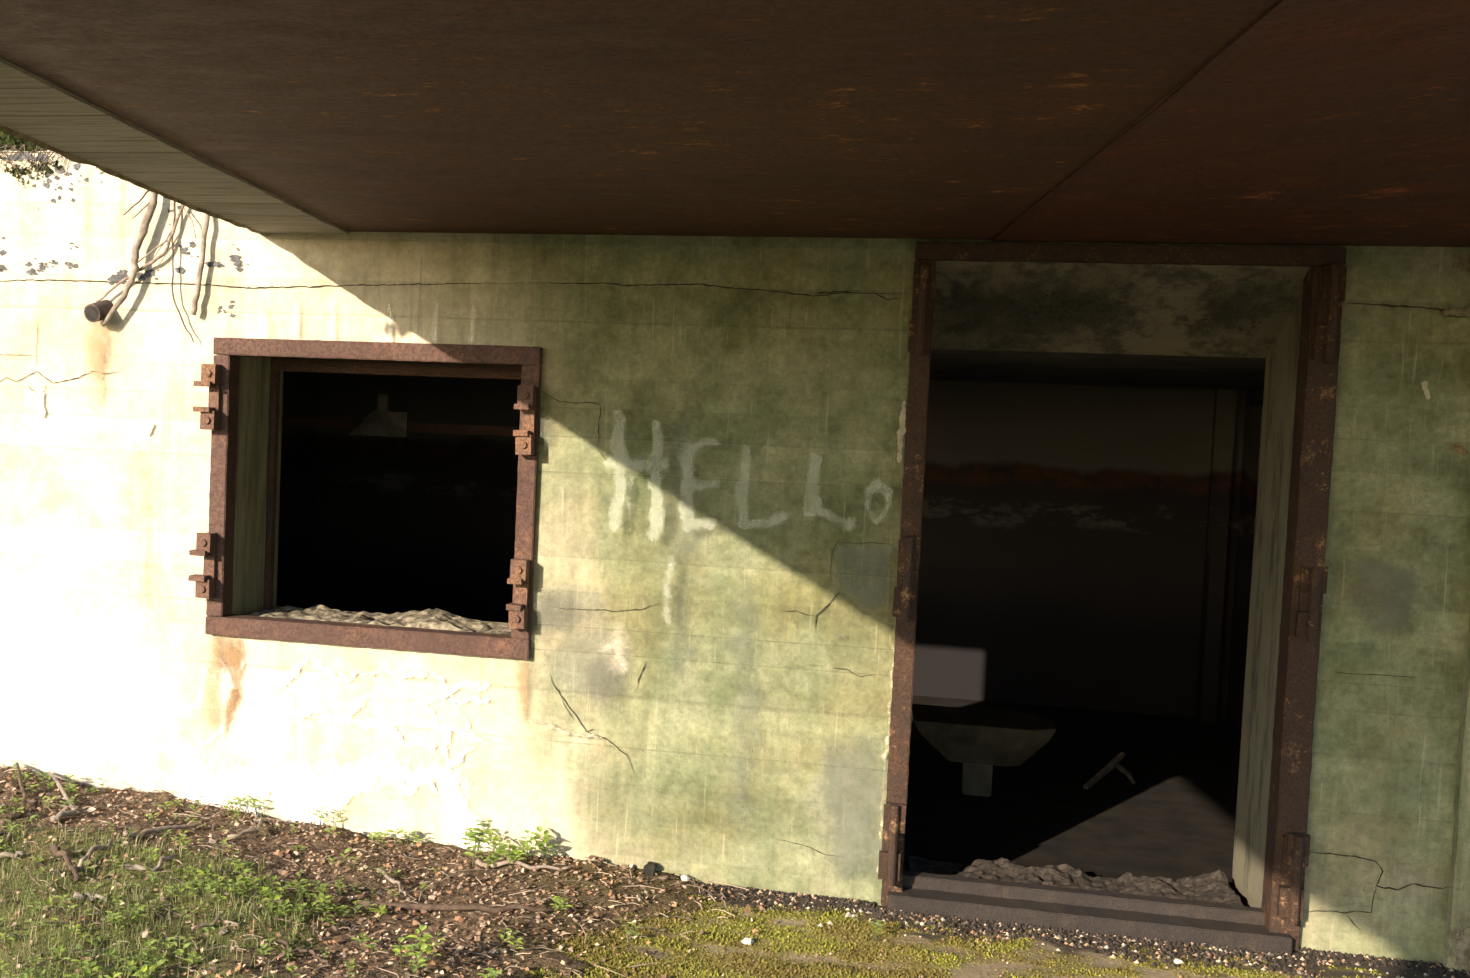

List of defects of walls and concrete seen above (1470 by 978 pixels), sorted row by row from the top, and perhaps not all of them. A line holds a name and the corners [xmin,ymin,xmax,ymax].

crack [9,279,899,300]
crack [1348,303,1465,318]
crack [0,323,126,393]
corrosion [218,640,242,729]
damp [0,564,493,852]
crack [550,675,635,777]
crack [1309,852,1464,929]